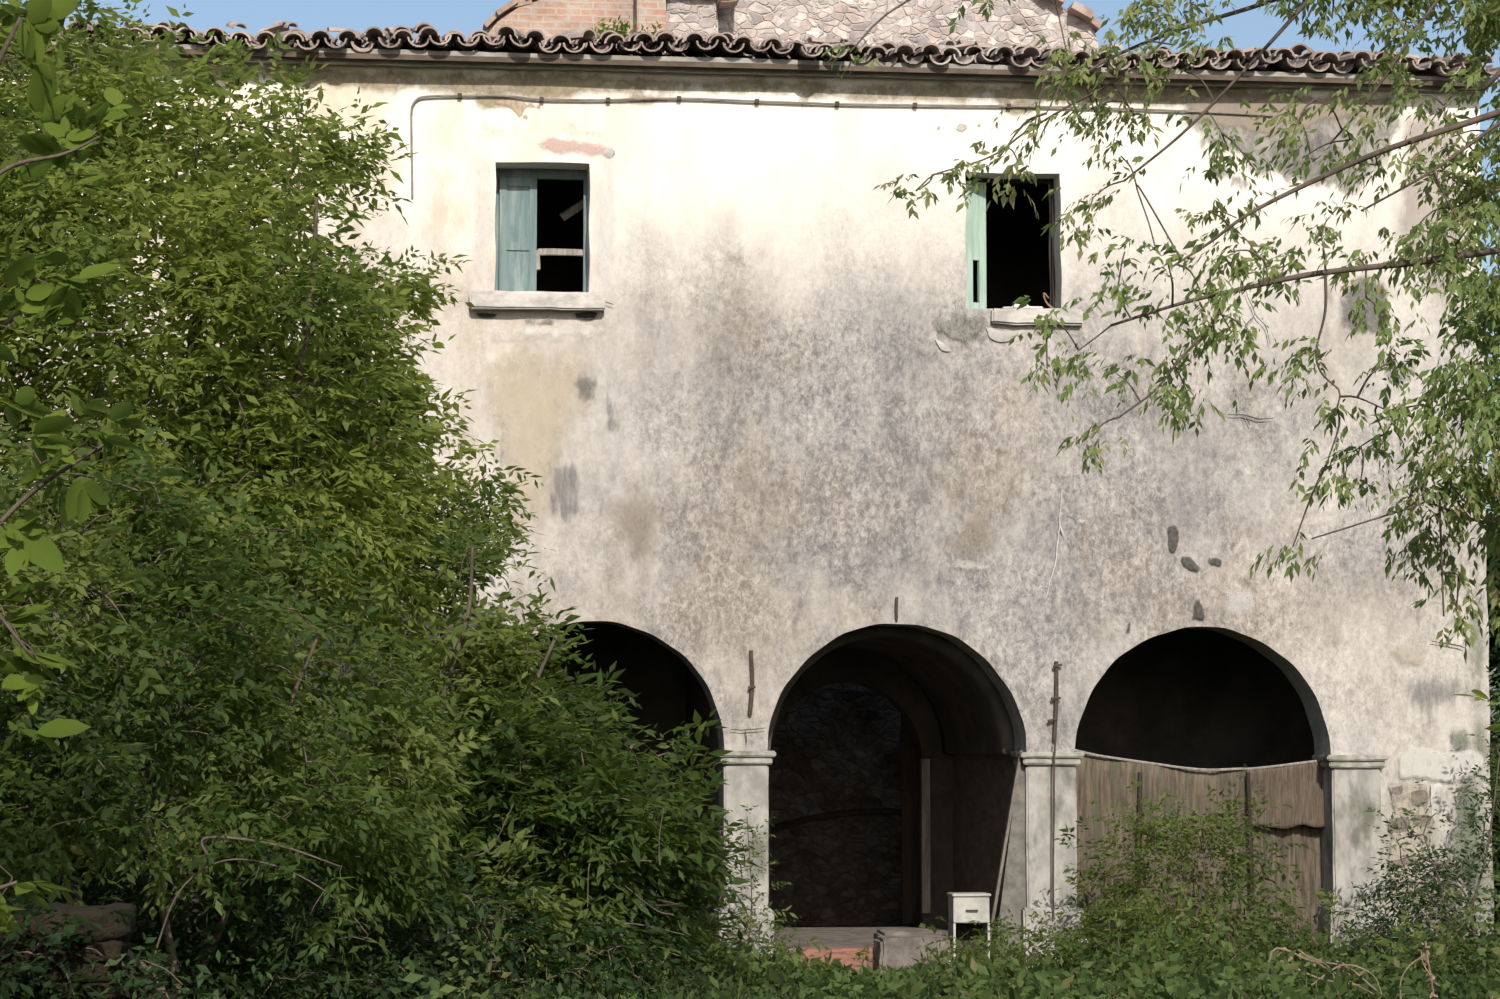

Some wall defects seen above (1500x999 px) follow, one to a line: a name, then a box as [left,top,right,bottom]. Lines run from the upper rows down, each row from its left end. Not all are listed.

flaking render [544,139,614,158]
water stain [489,359,595,524]
flaking render [1168,525,1222,571]
flaking render [1192,599,1205,619]